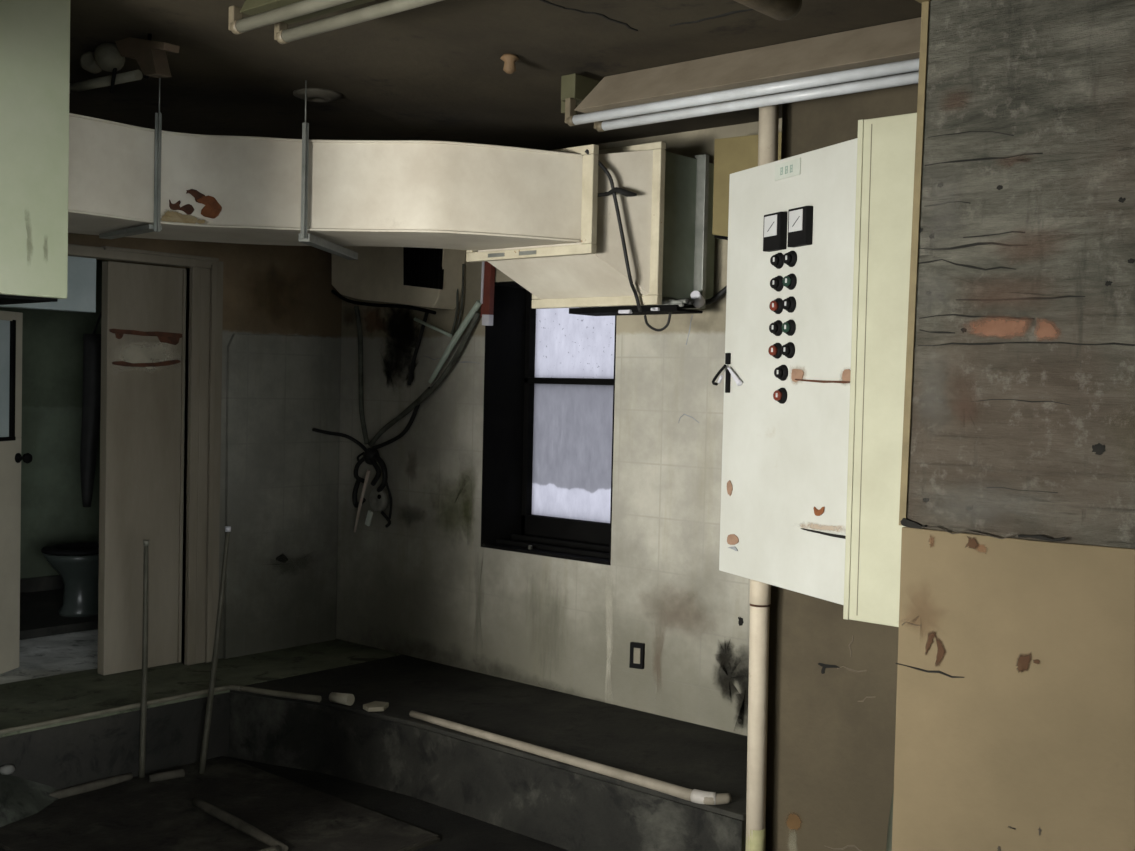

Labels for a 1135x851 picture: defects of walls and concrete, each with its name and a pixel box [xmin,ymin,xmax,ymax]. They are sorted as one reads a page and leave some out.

crack [540,0,638,31]
spalling [961,317,1058,339]
leakage [717,643,749,723]
crack [896,663,964,678]